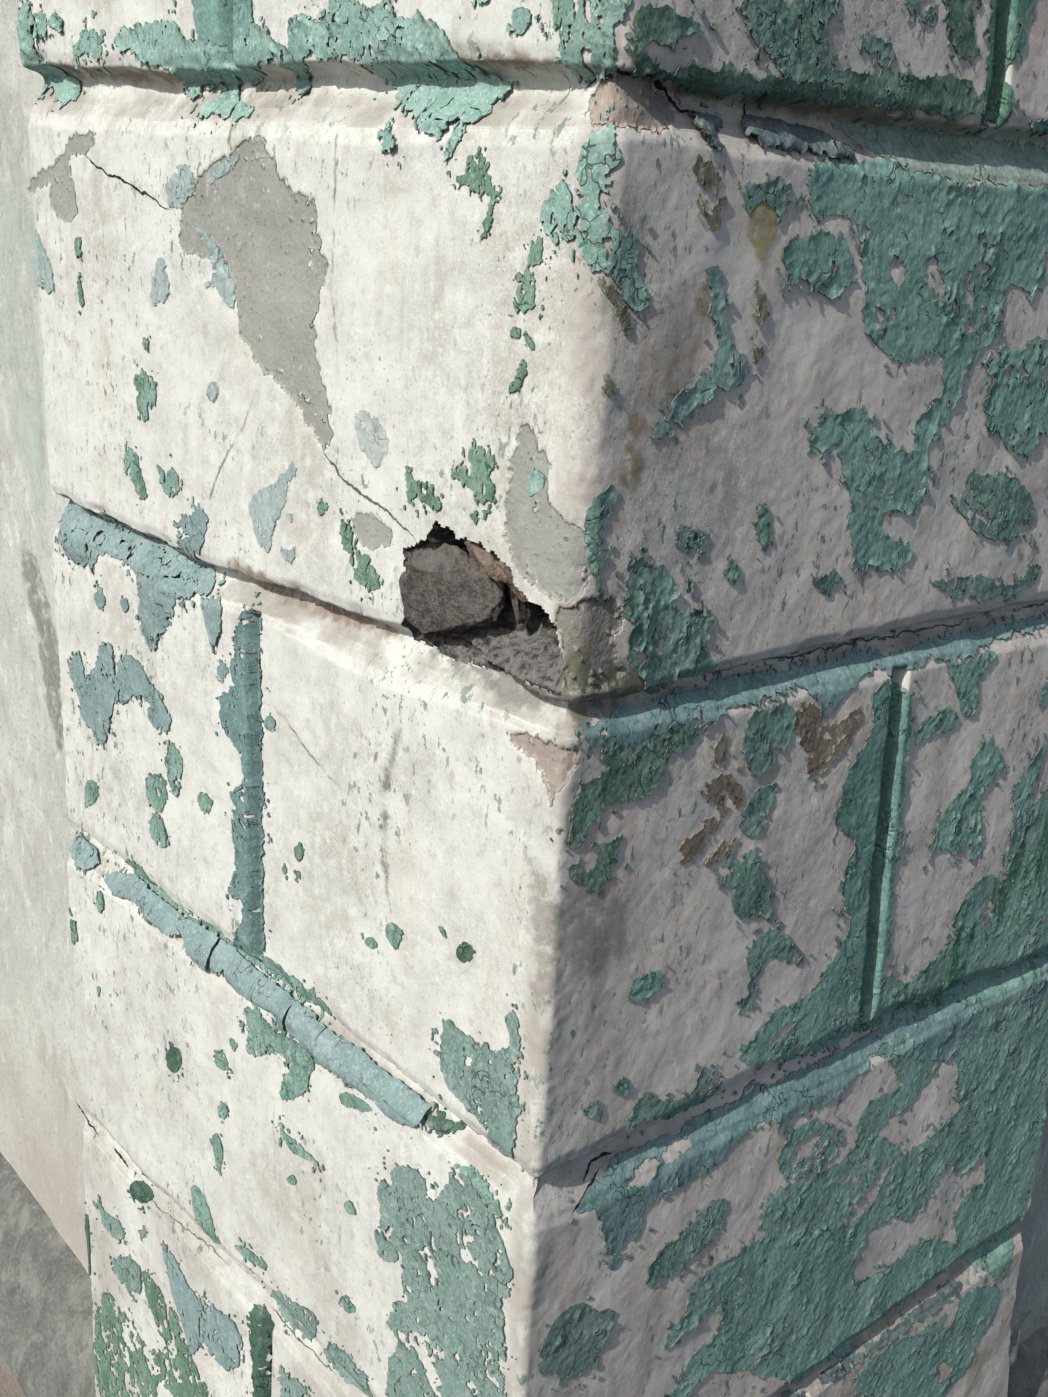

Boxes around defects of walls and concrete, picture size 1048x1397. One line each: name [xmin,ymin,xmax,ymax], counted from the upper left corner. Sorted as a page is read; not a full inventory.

crack [85,152,174,212]
peeling [16,0,518,450]
crack [583,68,747,116]
crack [323,451,414,537]
peeling [54,441,336,1022]
peeling [317,0,1048,1397]
peeling [165,1041,184,1082]
peeling [209,1101,229,1176]
peeling [213,1002,328,1182]
peeling [84,1149,517,1397]